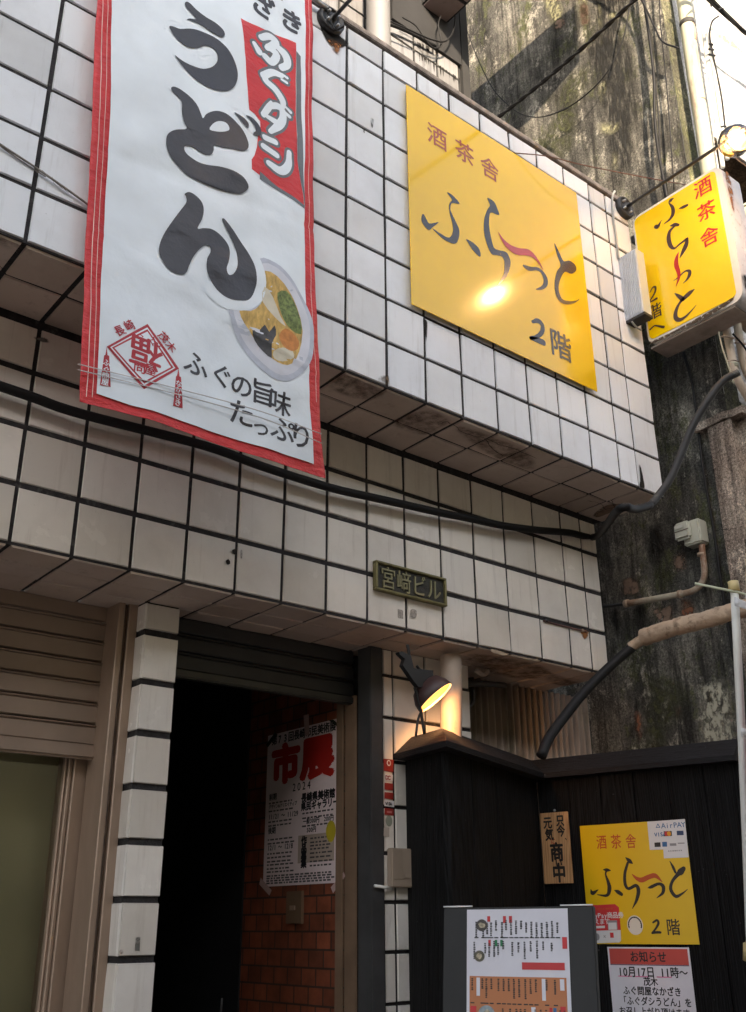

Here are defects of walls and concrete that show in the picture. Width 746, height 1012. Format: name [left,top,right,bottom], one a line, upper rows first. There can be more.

damp [591,0,633,178]
damp [698,682,733,743]